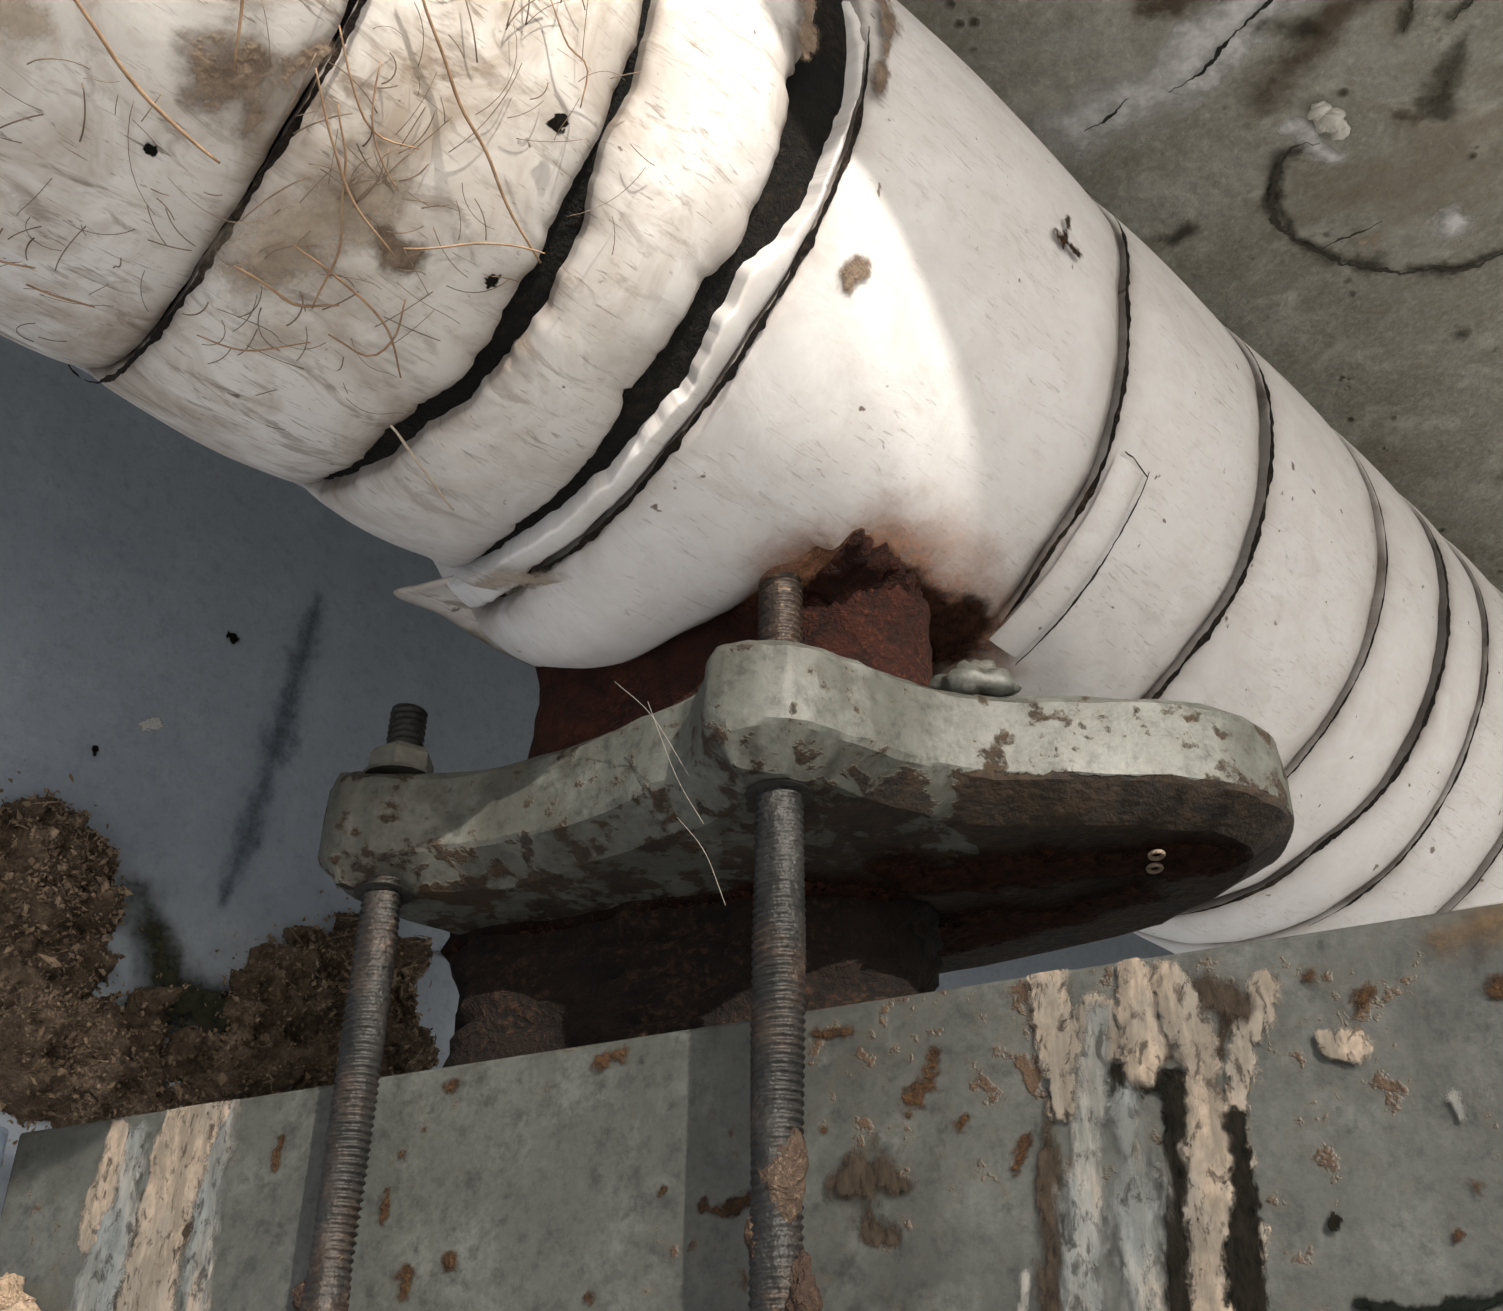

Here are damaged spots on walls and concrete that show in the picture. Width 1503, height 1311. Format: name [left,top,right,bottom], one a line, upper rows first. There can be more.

crack [1400,0,1414,32]
crack [1451,0,1474,21]
crack [1044,0,1299,150]
crack [1263,142,1503,276]
corrosion [865,522,1003,664]
corrosion [591,1045,628,1071]
corrosion [902,1046,942,1118]
leakage [1027,957,1281,1311]
corrosion [825,1133,912,1248]
corrosion [395,1264,414,1301]
corrosion [442,1250,457,1272]
leakage [1353,1290,1503,1311]